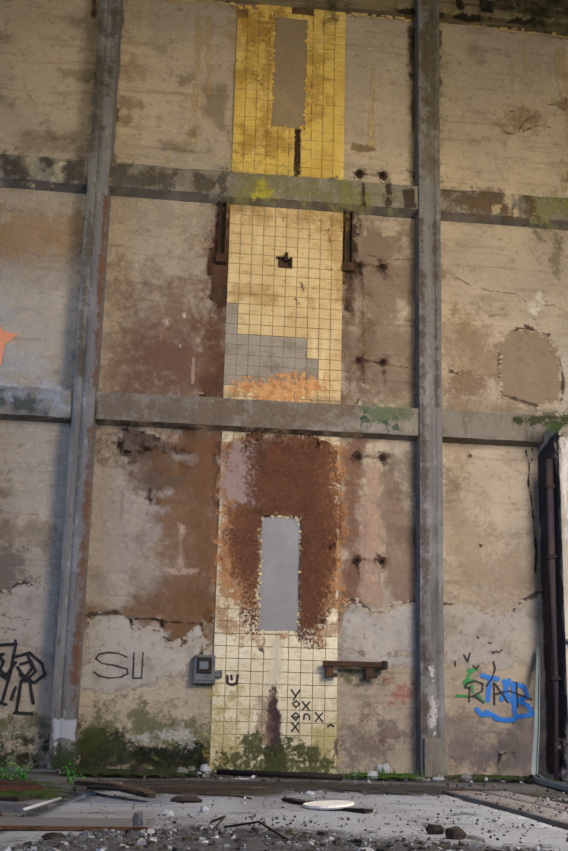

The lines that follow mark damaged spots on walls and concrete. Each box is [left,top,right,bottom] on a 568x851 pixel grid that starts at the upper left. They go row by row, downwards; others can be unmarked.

spalling [267,8,314,177]
corrosion [208,205,230,308]
peeling [449,324,565,410]
corrosion [135,430,416,649]
peeling [339,597,416,669]
water stain [538,433,568,774]
water stain [131,723,210,769]
water stain [264,686,286,772]
spalling [425,696,439,735]